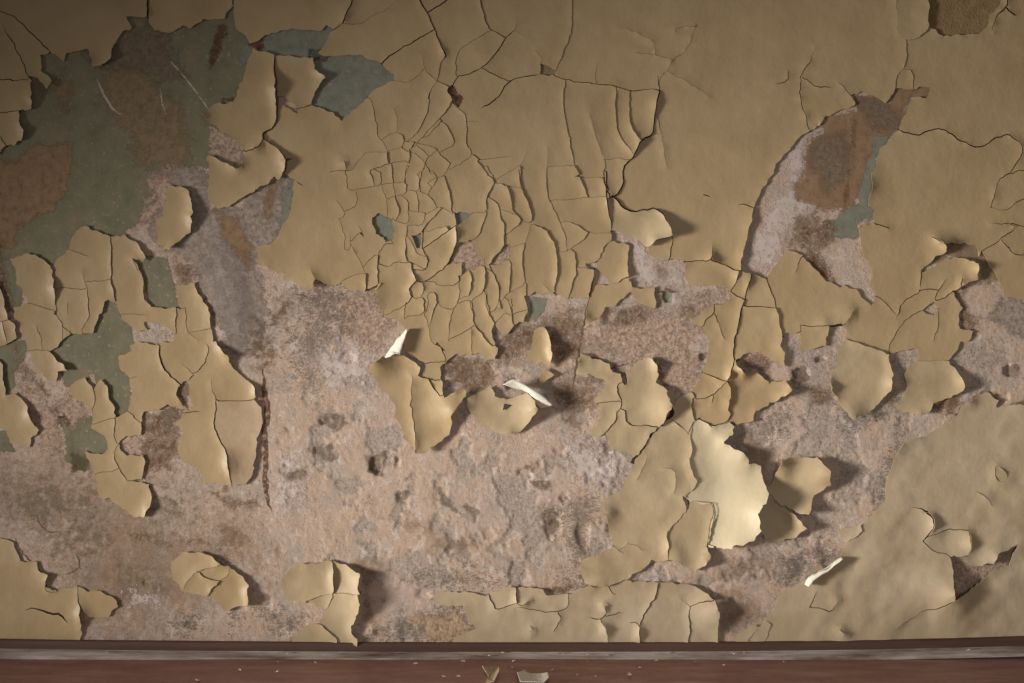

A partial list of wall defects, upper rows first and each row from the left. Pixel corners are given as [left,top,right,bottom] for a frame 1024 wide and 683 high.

crack [0,11,51,81]
peeling [0,0,434,209]
crack [315,0,854,396]
crack [898,128,1024,255]
peeling [0,161,263,518]
crack [261,369,272,511]
peeling [312,286,554,454]
peeling [405,138,831,643]
crack [631,408,674,464]
peeling [735,310,1024,642]
crack [27,608,67,622]
peeling [0,538,118,640]